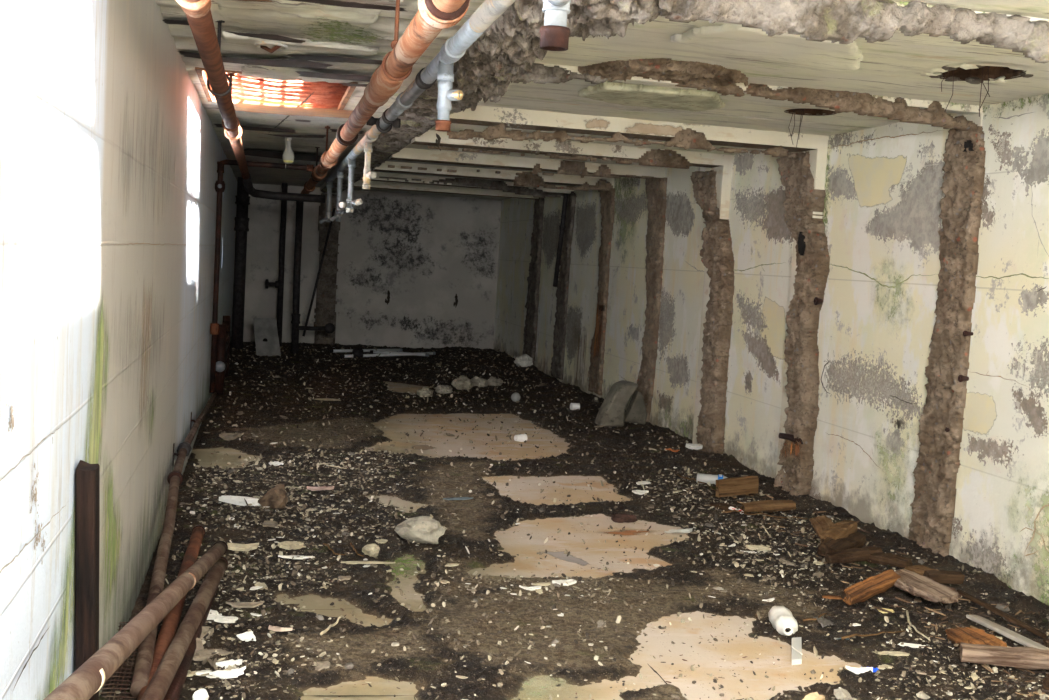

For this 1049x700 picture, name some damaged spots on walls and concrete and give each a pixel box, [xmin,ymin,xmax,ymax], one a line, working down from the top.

spalling [584,0,1049,84]
water stain [351,194,435,293]
crack [829,264,935,288]
water stain [347,311,478,346]
spalling [379,75,1049,583]
crack [0,422,66,481]
crack [0,506,65,573]